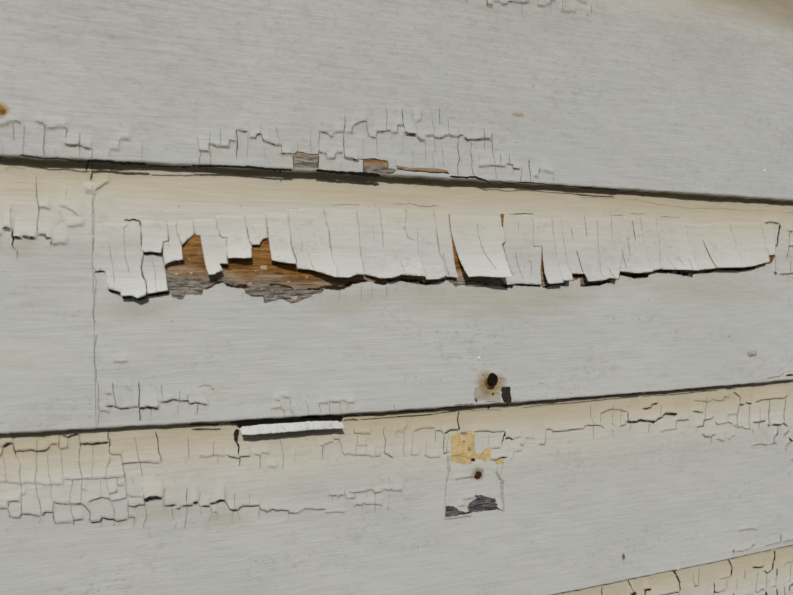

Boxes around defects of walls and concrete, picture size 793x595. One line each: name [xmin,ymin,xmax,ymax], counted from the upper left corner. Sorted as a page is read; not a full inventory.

crack [1,120,143,161]
crack [197,107,554,181]
crack [3,182,207,420]
peeling [93,203,776,303]
crack [123,429,392,527]
peeling [230,415,345,435]
crack [322,412,521,508]
crack [541,403,688,445]